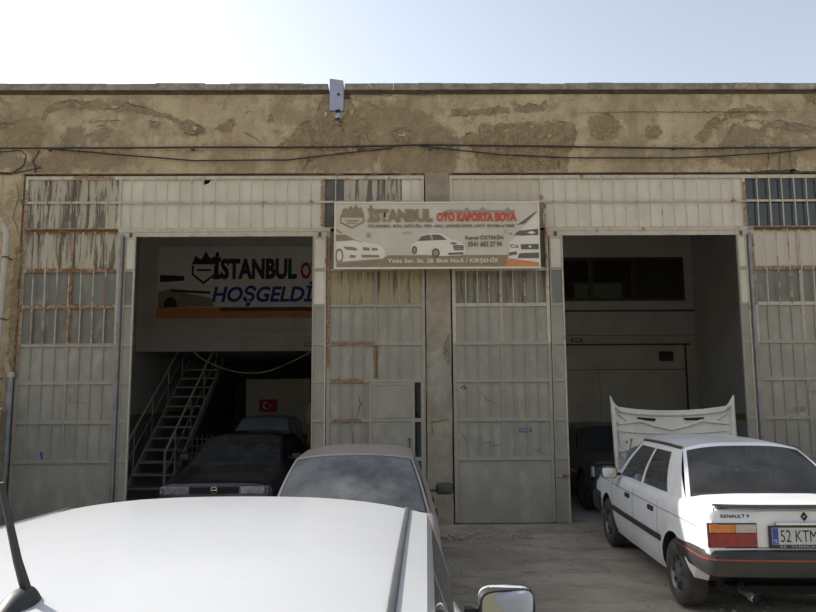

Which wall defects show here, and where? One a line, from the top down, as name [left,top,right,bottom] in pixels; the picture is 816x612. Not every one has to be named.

peeling [40,99,204,136]
flaking render [452,100,577,173]
peeling [696,105,816,143]
rust [14,190,117,377]